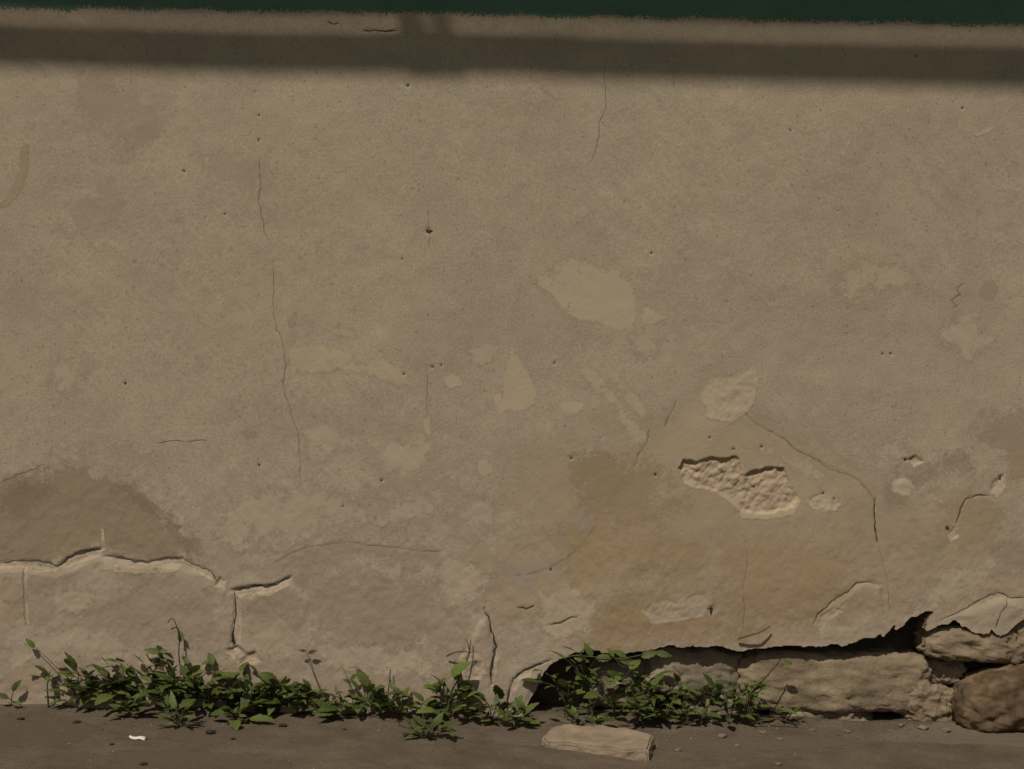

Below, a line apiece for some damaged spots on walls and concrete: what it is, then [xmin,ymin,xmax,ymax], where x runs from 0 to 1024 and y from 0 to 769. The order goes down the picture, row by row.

crack [257,160,301,474]
spalling [740,492,842,521]
crack [747,415,890,624]
crack [956,494,989,521]
crack [0,540,443,645]
damp [0,460,518,716]
crack [466,610,551,716]
peeling [529,583,608,642]
spalling [639,591,714,624]
peeling [893,557,1001,631]